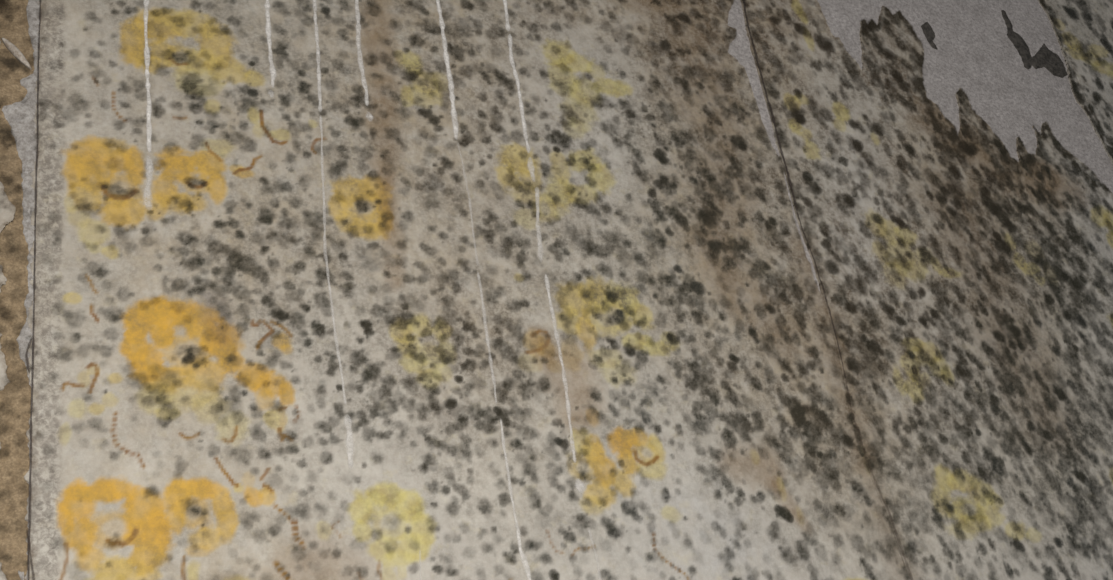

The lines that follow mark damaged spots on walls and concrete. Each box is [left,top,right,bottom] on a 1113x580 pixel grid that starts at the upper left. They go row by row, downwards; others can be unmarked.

peeling [0,0,40,580]
water stain [112,0,160,206]
water stain [174,204,295,294]
water stain [265,0,294,125]
water stain [262,248,346,346]
water stain [298,0,329,128]
water stain [327,297,549,580]
water stain [388,0,594,255]
water stain [545,276,587,498]
water stain [593,76,766,269]
water stain [649,266,710,337]
water stain [667,0,1113,580]